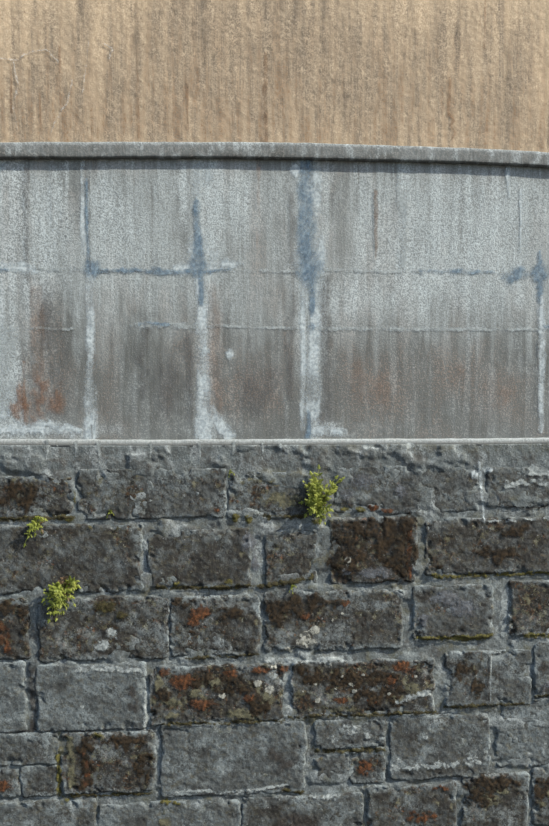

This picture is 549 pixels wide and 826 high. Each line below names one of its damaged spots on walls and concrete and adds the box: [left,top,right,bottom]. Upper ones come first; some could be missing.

leakage [0,164,247,465]
leakage [258,160,368,382]
leakage [300,390,347,439]
leakage [504,251,549,433]